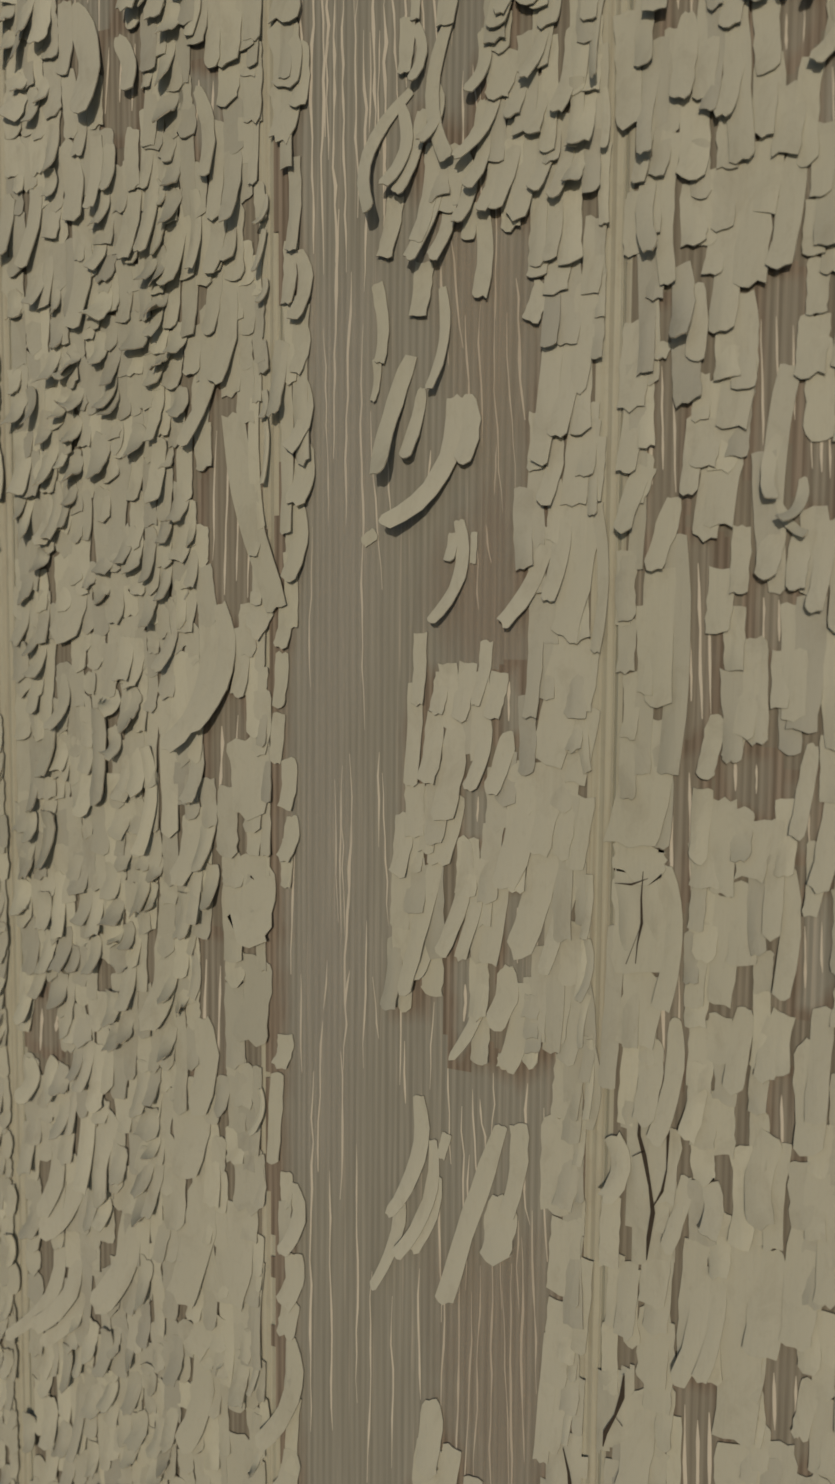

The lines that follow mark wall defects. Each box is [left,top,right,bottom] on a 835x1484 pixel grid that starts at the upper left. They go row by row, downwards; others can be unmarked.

peeling [0,0,315,1484]
peeling [266,0,835,1484]